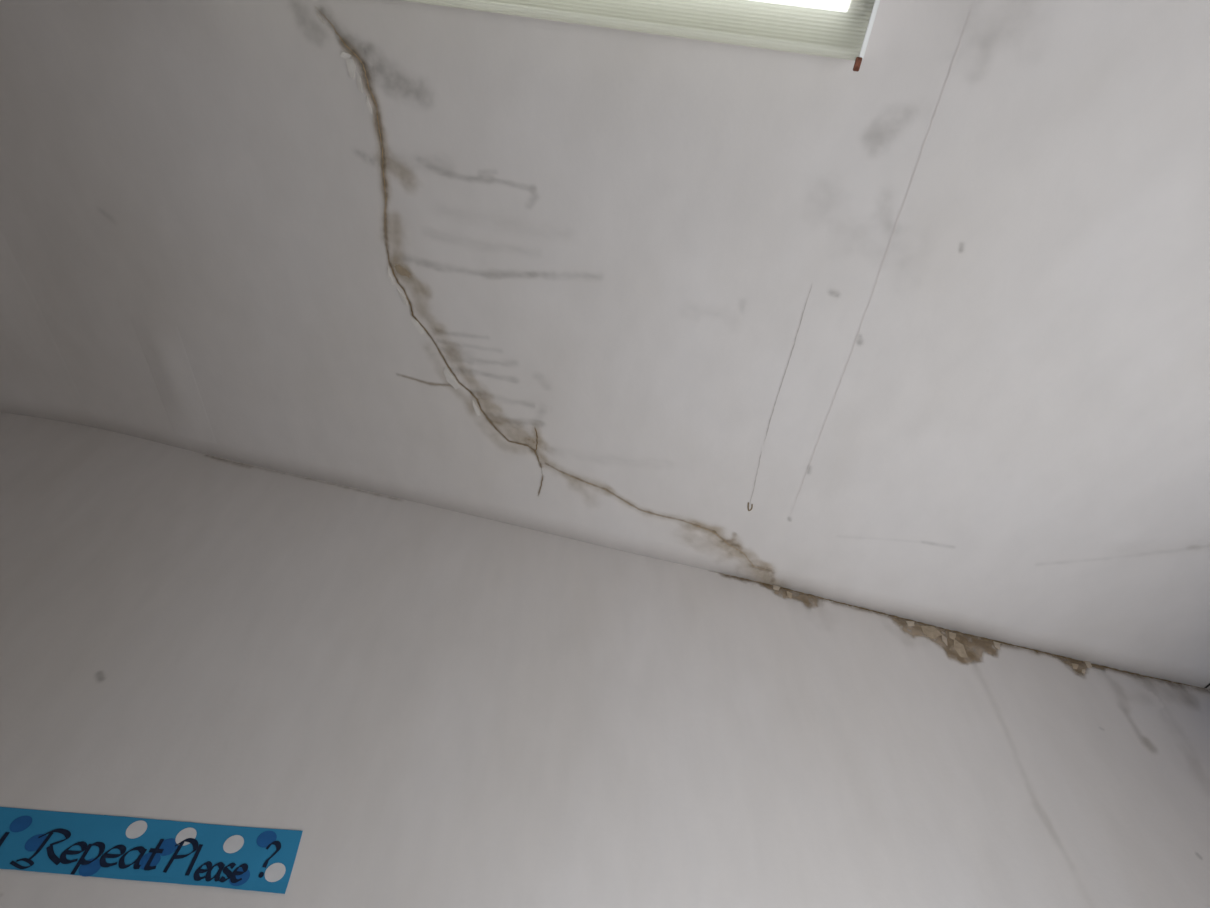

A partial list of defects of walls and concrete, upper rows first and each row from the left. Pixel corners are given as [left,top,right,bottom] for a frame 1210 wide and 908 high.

crack [316,5,1209,690]
flaking render [757,581,818,606]
flaking render [892,618,1001,663]
flaking render [1052,655,1103,674]